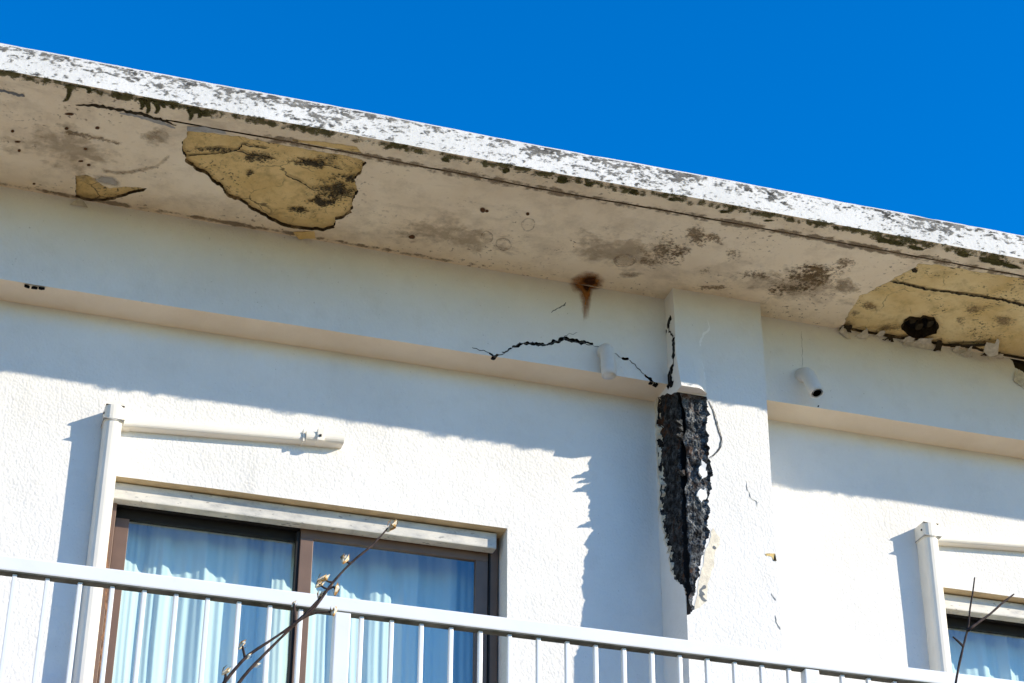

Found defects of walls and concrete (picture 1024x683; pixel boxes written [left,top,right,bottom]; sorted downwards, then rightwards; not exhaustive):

peeling [70,104,366,239]
corrosion [574,274,600,312]
crack [472,315,722,457]
water stain [772,258,853,293]
peeling [839,263,1024,389]
spalling [654,392,720,615]